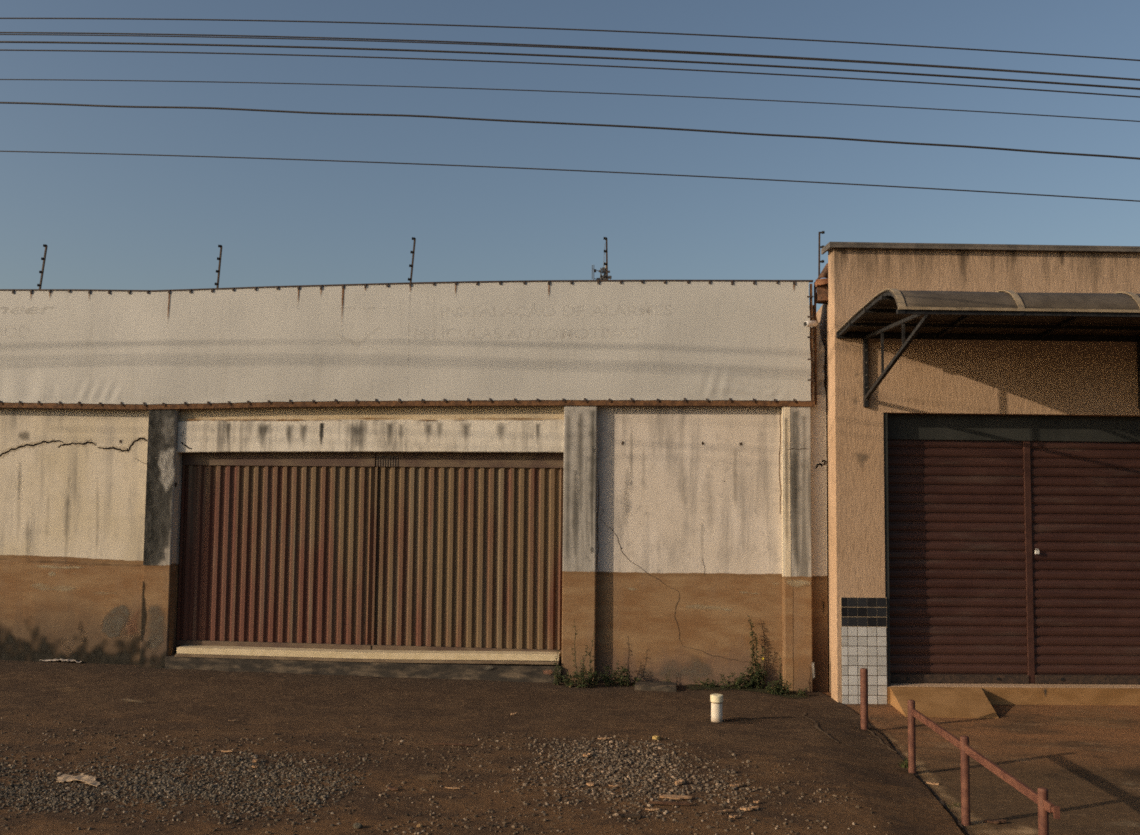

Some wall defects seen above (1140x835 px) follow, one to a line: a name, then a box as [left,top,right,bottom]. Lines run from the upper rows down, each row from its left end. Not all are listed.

crack [0,436,148,464]
leakage [143,409,175,566]
leakage [579,416,594,478]
leakage [786,452,797,507]
crack [597,480,750,663]
leakage [0,582,167,668]